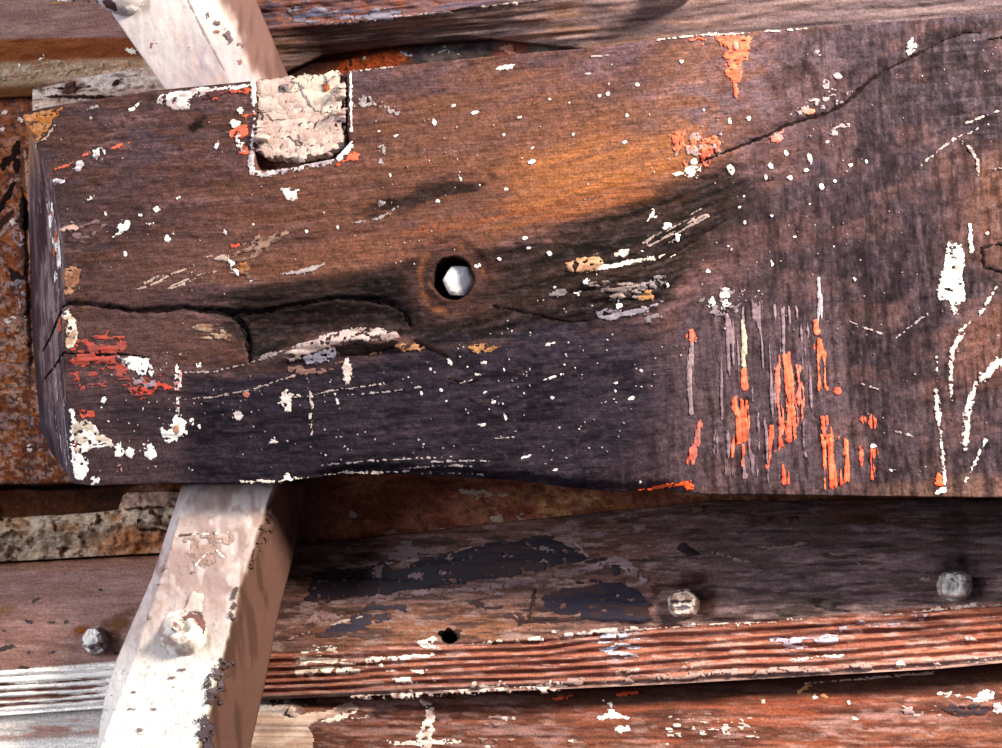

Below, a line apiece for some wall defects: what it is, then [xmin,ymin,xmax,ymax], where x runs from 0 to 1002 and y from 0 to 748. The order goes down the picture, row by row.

peeling [157,66,401,177]
rust [335,49,413,74]
crack [698,30,1002,163]
peeling [280,187,299,201]
crack [644,218,729,267]
peeling [55,310,201,485]
crack [42,298,484,383]
crack [493,304,594,322]
peeling [686,329,702,465]
peeling [699,277,842,485]
peeling [820,414,879,490]
peeling [251,525,1002,748]